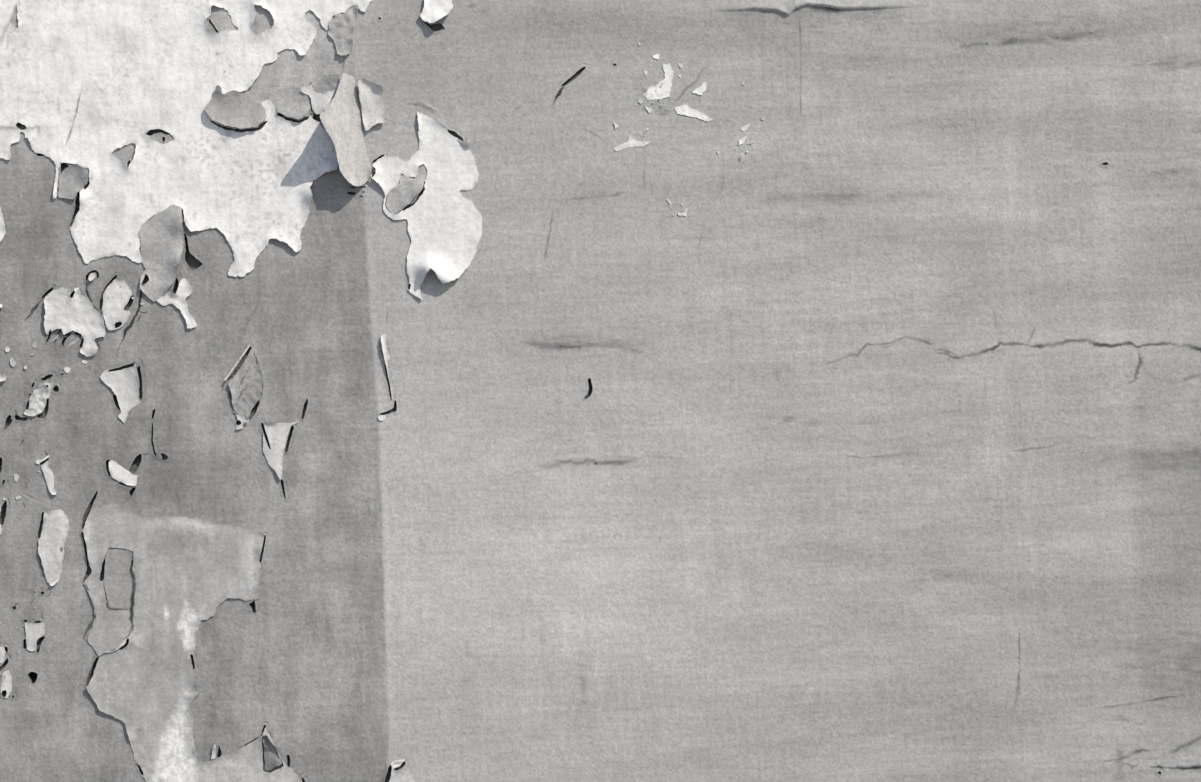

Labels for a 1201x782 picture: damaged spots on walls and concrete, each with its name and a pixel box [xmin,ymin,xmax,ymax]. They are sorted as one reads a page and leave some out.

spalling [553,64,589,105]
peeling [0,0,482,432]
spalling [224,343,311,502]
crack [1093,342,1162,362]
peeling [0,450,308,782]
peeling [382,759,415,782]